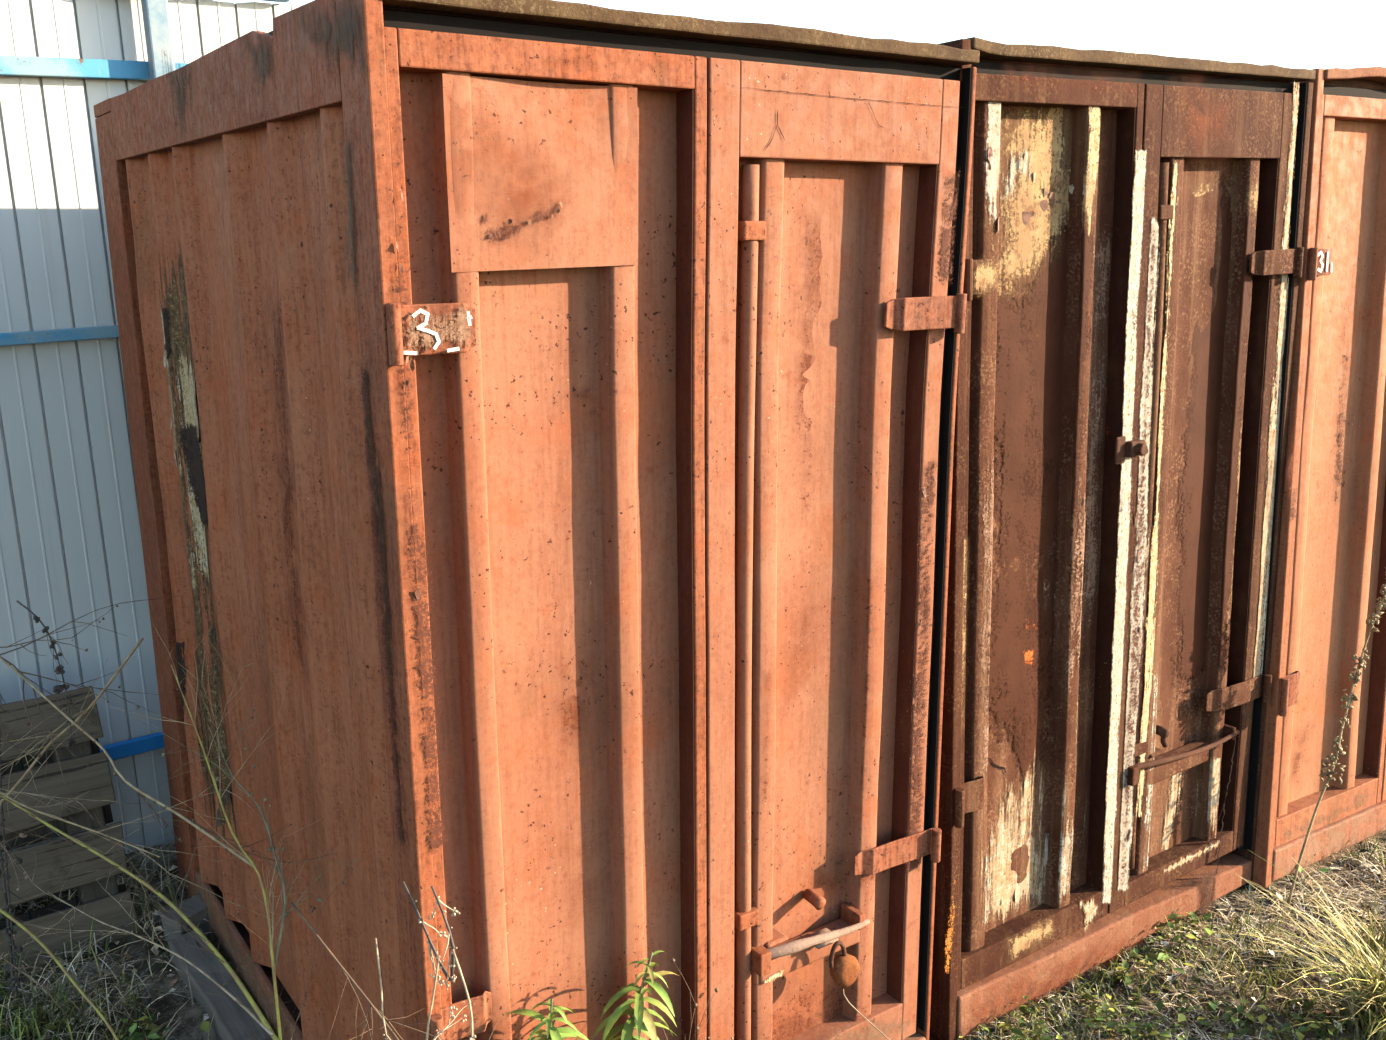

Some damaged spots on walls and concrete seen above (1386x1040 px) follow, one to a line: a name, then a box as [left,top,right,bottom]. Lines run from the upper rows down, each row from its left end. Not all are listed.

peeling [152,241,238,850]
corrosion [360,366,406,847]
corrosion [392,188,412,305]
corrosion [395,356,448,854]
peeling [974,102,1100,314]
corrosion [980,221,1095,781]
peeling [980,150,1220,960]
corrosion [1171,173,1257,686]
peeling [1231,420,1243,603]
corrosion [945,880,957,973]